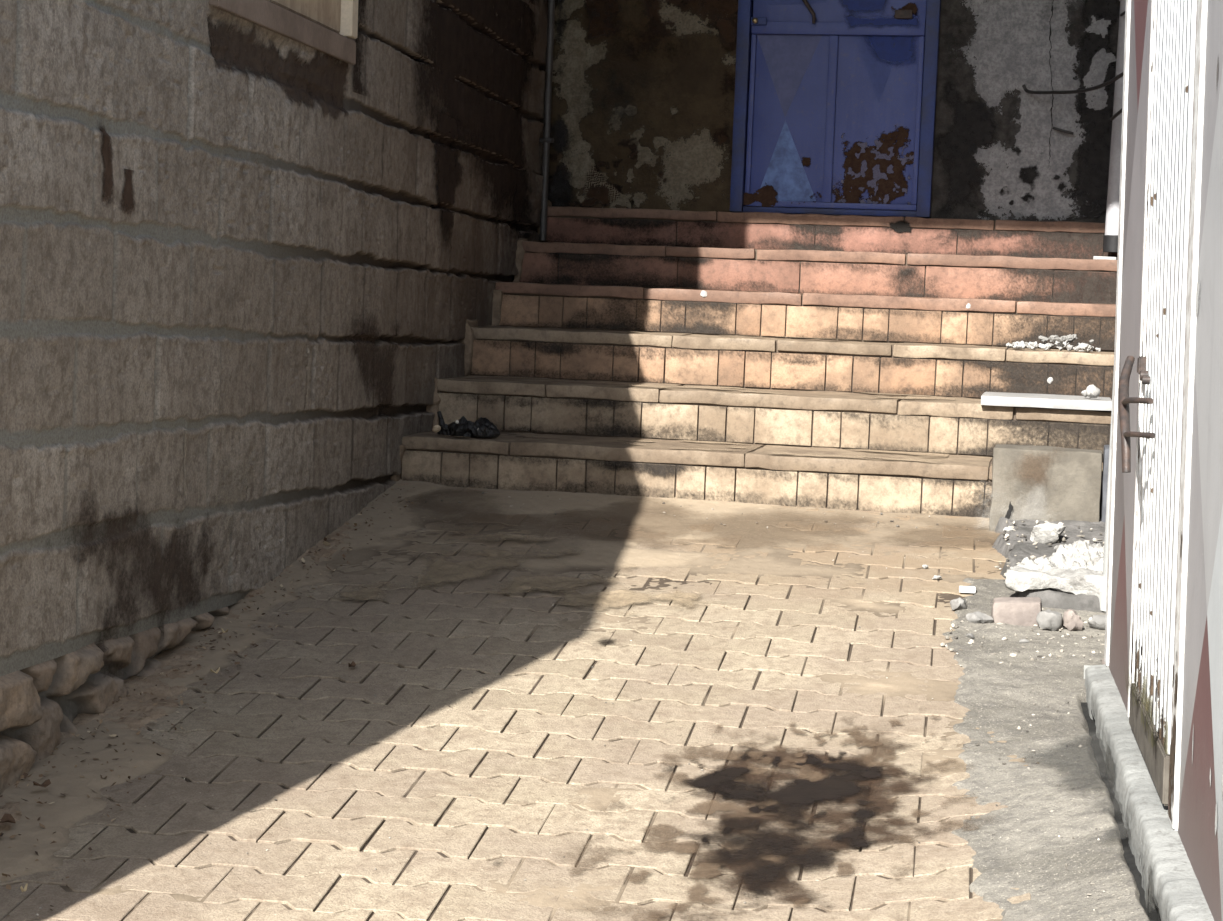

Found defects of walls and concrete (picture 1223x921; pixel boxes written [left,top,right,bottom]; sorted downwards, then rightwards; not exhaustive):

peeling [548,0,732,211]
rust [743,125,914,210]
peeling [949,0,1088,221]
leakage [347,314,398,418]
leakage [684,762,888,896]